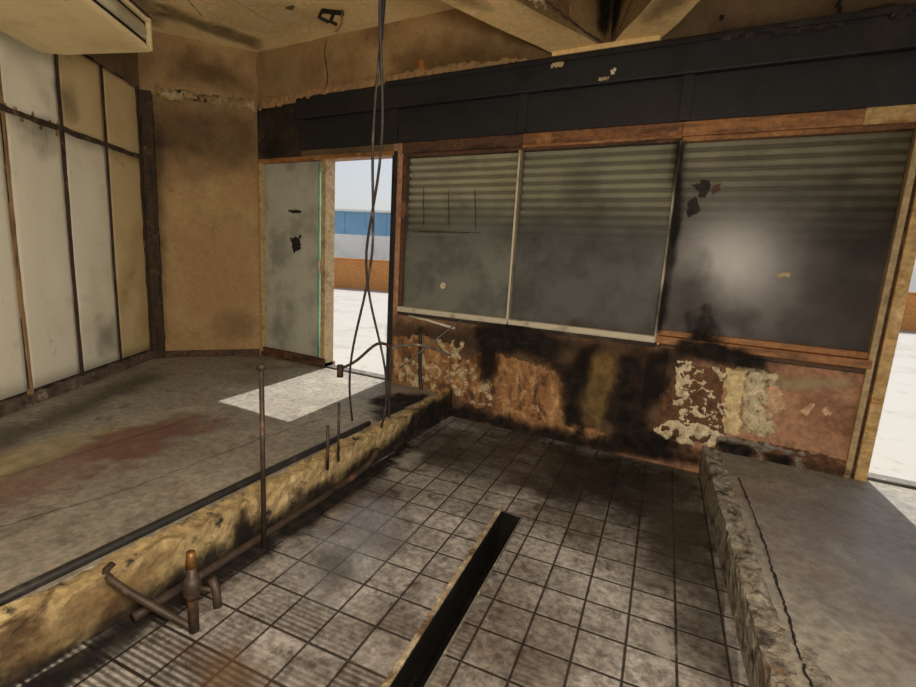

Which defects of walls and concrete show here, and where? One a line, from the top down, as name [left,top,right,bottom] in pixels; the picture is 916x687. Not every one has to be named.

water stain [479,348,498,382]
water stain [579,345,615,432]
peeling [654,360,856,475]
spalling [67,334,749,687]
crack [738,477,814,687]
spalling [15,636,98,687]